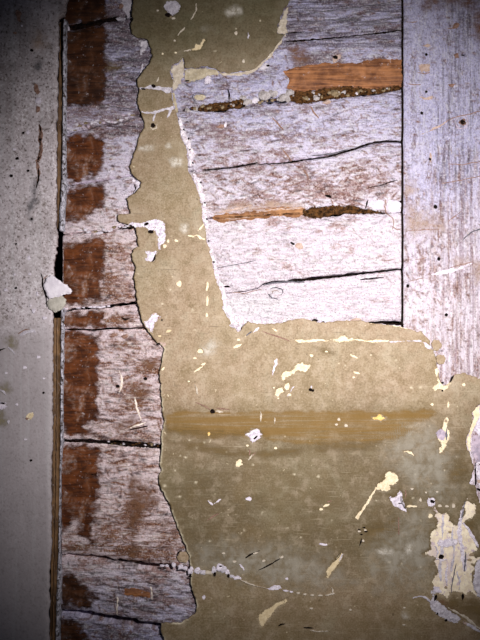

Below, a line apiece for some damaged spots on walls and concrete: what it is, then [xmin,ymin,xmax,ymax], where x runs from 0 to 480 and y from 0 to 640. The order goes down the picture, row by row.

peeling [65,0,109,107]
peeling [171,8,289,90]
crack [286,1,402,42]
peeling [65,131,107,222]
crack [204,140,400,170]
flaking render [129,219,178,262]
peeling [172,117,289,348]
crack [223,269,401,294]
peeling [36,238,128,544]
crack [64,439,161,448]
peeling [466,406,480,491]
peeling [355,471,480,632]